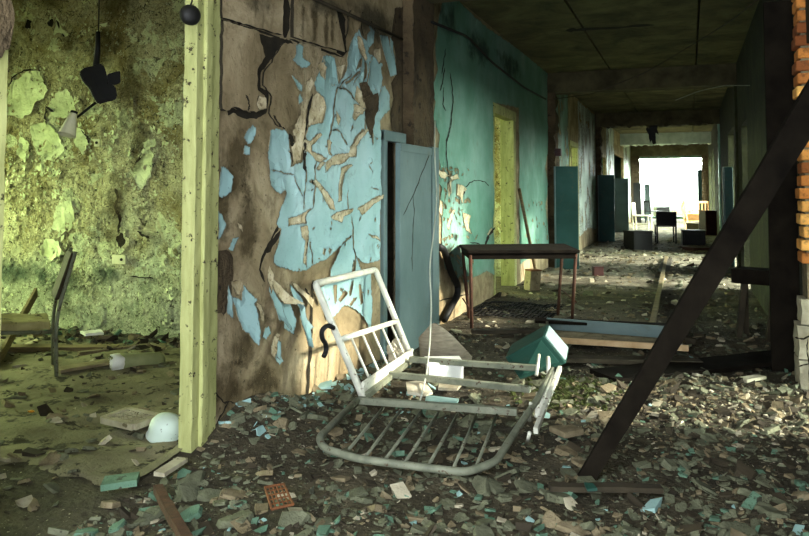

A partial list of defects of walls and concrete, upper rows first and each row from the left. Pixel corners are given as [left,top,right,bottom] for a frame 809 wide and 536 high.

crack [221,0,347,57]
peeling [7,70,76,162]
peeling [74,127,89,155]
peeling [133,138,156,190]
peeling [217,7,403,365]
crack [403,49,489,269]
peeling [433,1,597,285]
peeling [39,198,76,261]
hole [112,227,130,255]